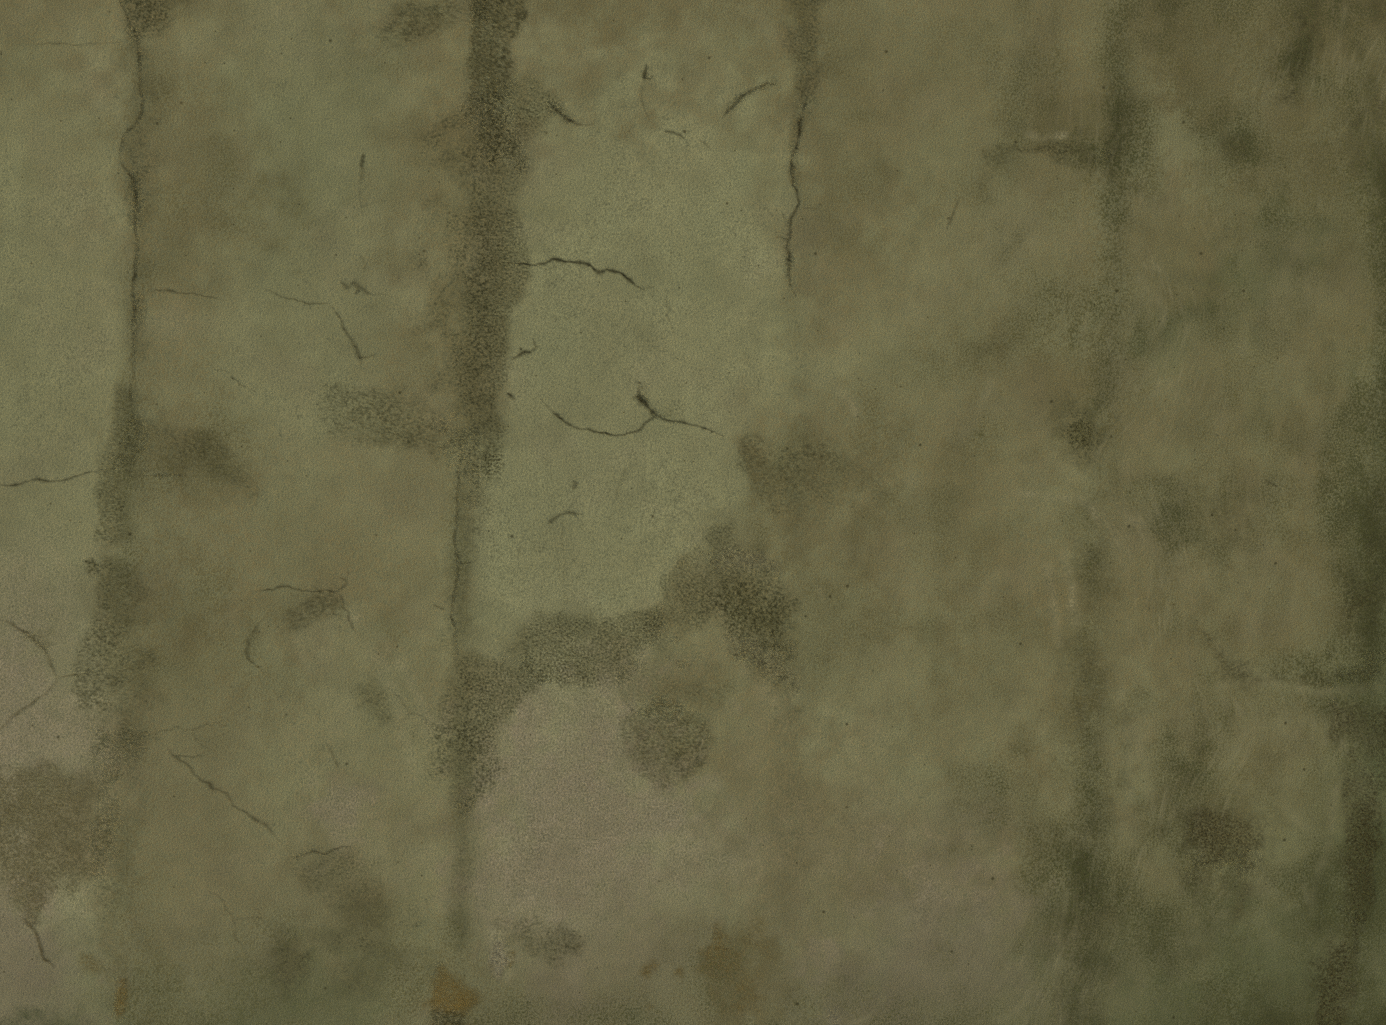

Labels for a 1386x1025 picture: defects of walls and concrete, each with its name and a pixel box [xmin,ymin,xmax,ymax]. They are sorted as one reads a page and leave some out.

damp [464,0,538,174]
damp [454,192,525,474]
crack [517,258,634,284]
crack [555,396,706,435]
damp [680,528,797,677]
damp [439,613,655,778]
damp [0,767,94,918]